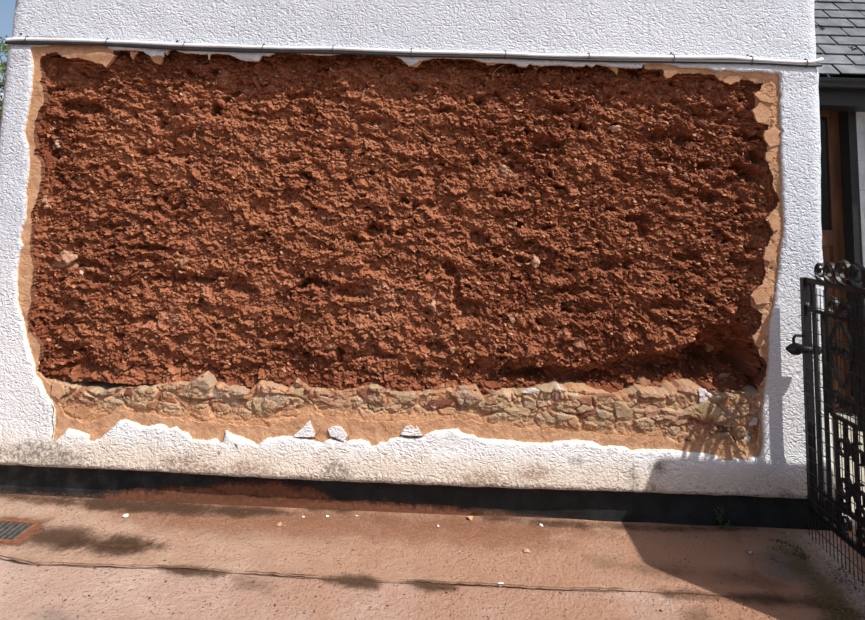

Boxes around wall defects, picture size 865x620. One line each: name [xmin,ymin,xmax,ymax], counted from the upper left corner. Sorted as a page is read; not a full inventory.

spalling [18,45,783,460]